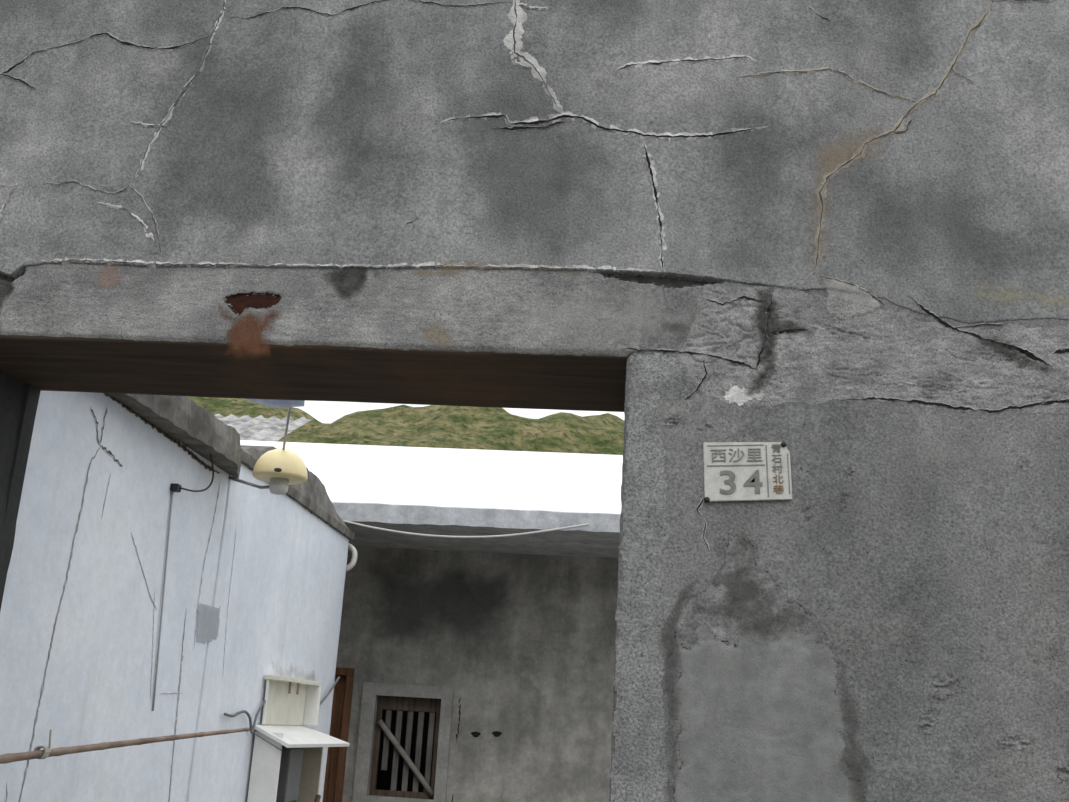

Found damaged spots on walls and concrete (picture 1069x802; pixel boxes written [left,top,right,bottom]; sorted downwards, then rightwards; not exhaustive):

crack [0,0,768,278]
crack [617,0,1069,367]
rust [224,292,281,354]
crack [625,290,807,400]
water stain [750,292,810,393]
spalling [677,277,1069,416]
crack [837,396,1069,414]
crack [6,407,123,802]